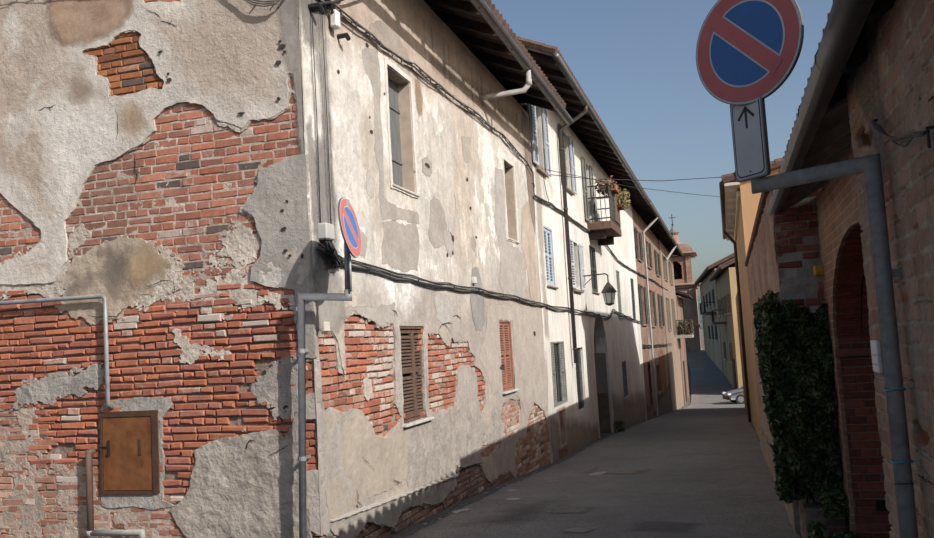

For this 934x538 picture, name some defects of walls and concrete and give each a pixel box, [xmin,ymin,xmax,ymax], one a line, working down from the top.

flaking render [84,32,172,96]
water stain [105,247,166,295]
flaking render [0,76,405,538]
peeling [355,167,551,538]